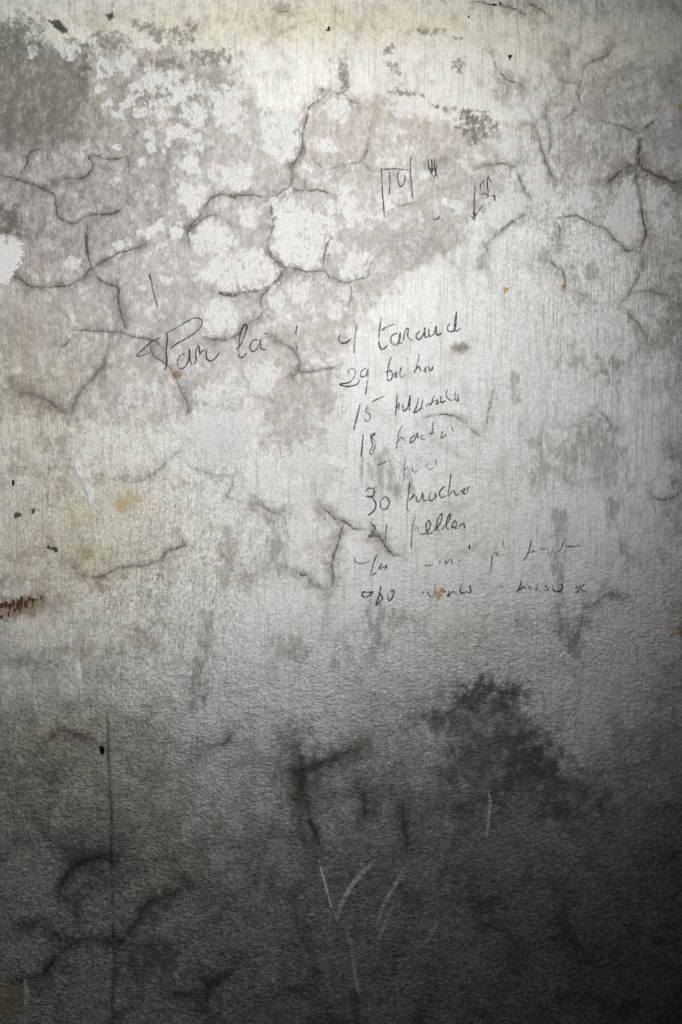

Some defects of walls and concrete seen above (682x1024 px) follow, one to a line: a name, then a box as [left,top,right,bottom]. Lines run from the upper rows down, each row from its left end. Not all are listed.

leakage [0,13,67,49]
crack [609,122,676,183]
peeling [62,255,82,270]
crack [7,150,189,408]
peeling [94,50,374,340]
crack [187,101,369,334]
crack [558,208,647,252]
peeling [189,356,283,467]
peeling [281,409,353,480]
crack [325,510,394,583]
corrosion [0,596,44,619]
leakage [455,678,526,713]